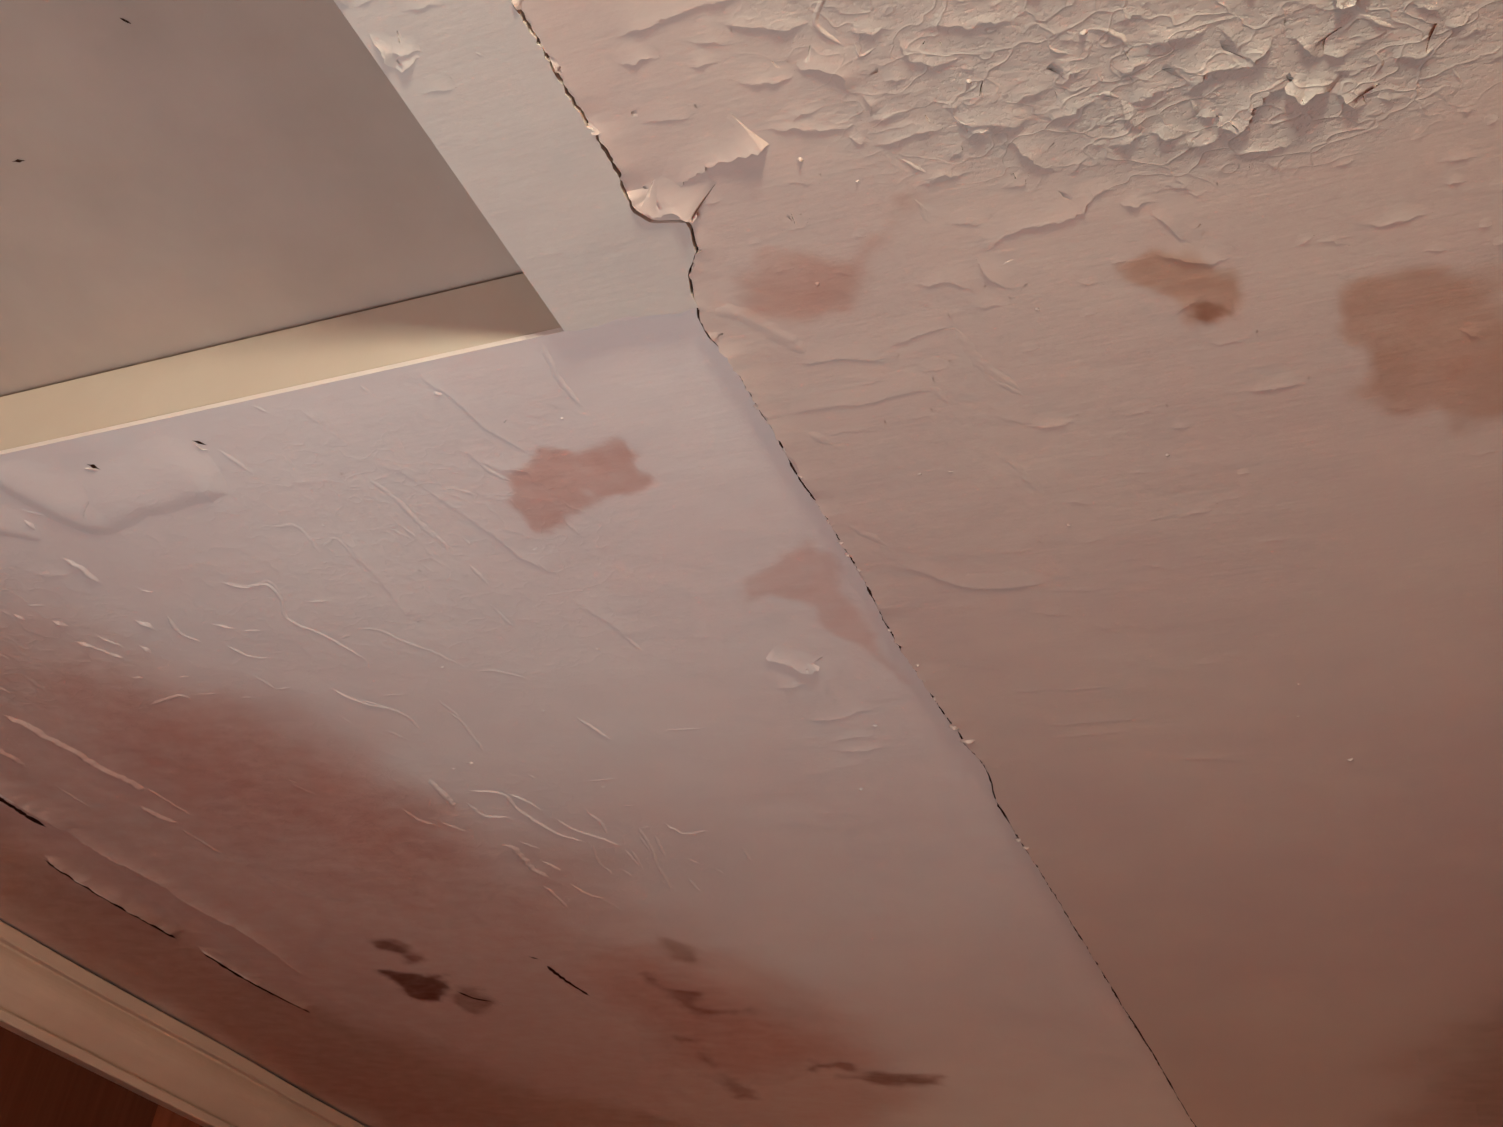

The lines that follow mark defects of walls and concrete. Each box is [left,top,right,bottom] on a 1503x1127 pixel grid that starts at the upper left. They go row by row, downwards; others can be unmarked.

peeling [612,39,660,65]
peeling [662,114,768,187]
peeling [717,0,812,31]
peeling [797,0,1503,211]
crack [512,0,1197,1127]
peeling [2,715,225,857]
peeling [0,748,320,1011]
leakage [383,972,443,1000]